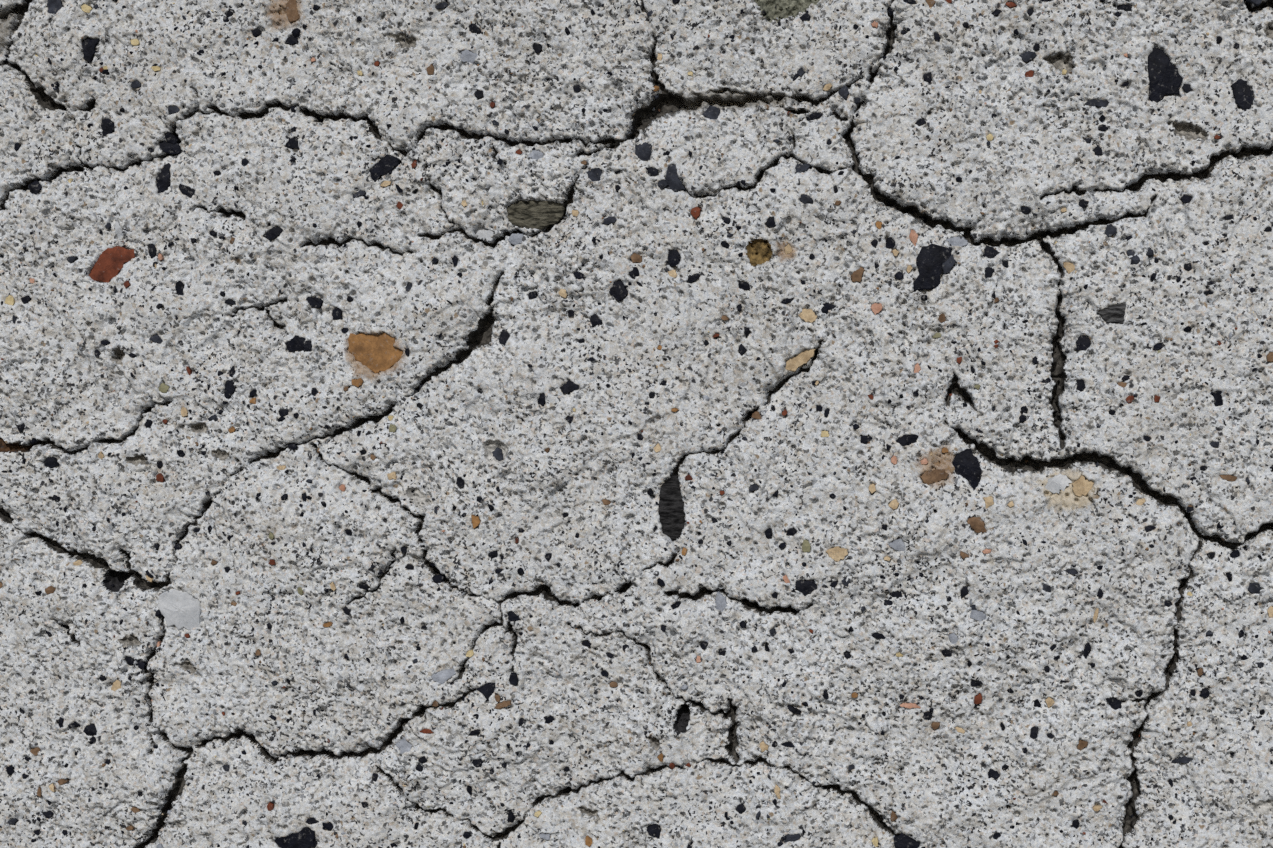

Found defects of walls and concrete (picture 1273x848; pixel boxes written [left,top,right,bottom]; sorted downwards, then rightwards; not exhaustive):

crack [0,0,173,211]
crack [171,35,1156,449]
crack [881,0,897,58]
crack [1040,146,1273,200]
crack [1244,0,1273,12]
crack [0,272,896,848]
crack [945,418,1273,848]